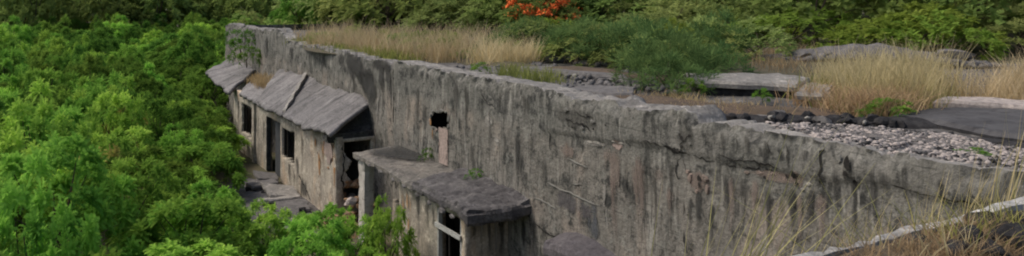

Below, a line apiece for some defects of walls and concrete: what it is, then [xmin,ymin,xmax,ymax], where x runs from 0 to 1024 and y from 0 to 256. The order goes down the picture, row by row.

leakage [339,51,425,118]
leakage [558,187,607,238]
leakage [688,193,714,231]
crack [645,134,789,245]